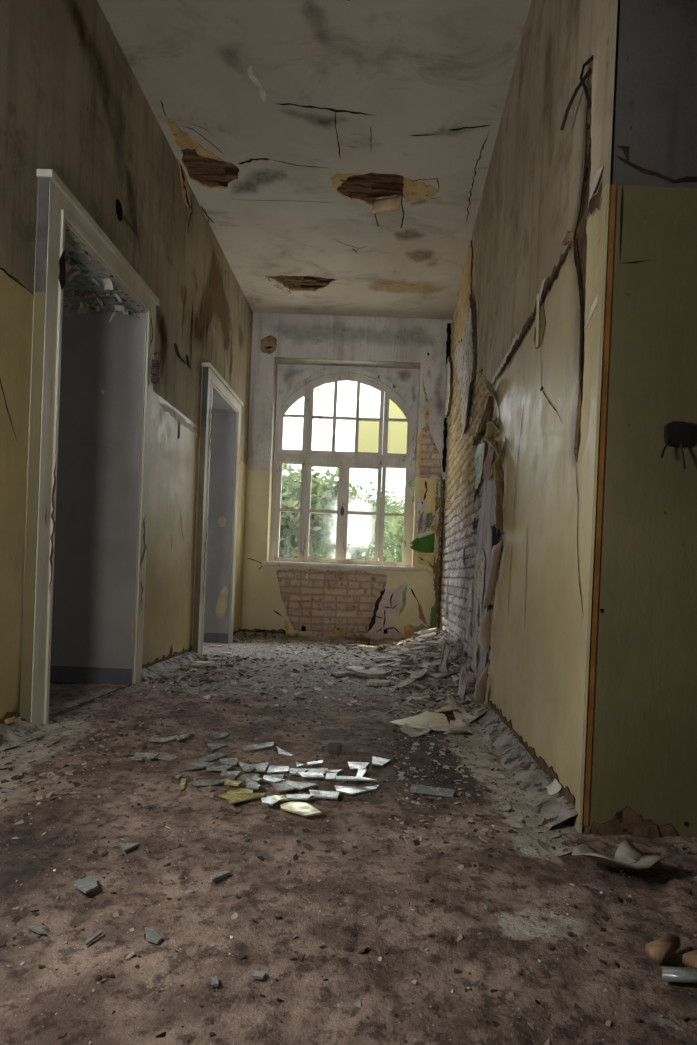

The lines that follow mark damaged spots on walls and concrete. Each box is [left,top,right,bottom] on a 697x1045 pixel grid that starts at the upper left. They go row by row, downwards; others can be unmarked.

crack [0,267,34,295]
crack [0,377,18,442]
flaking render [233,55,603,826]